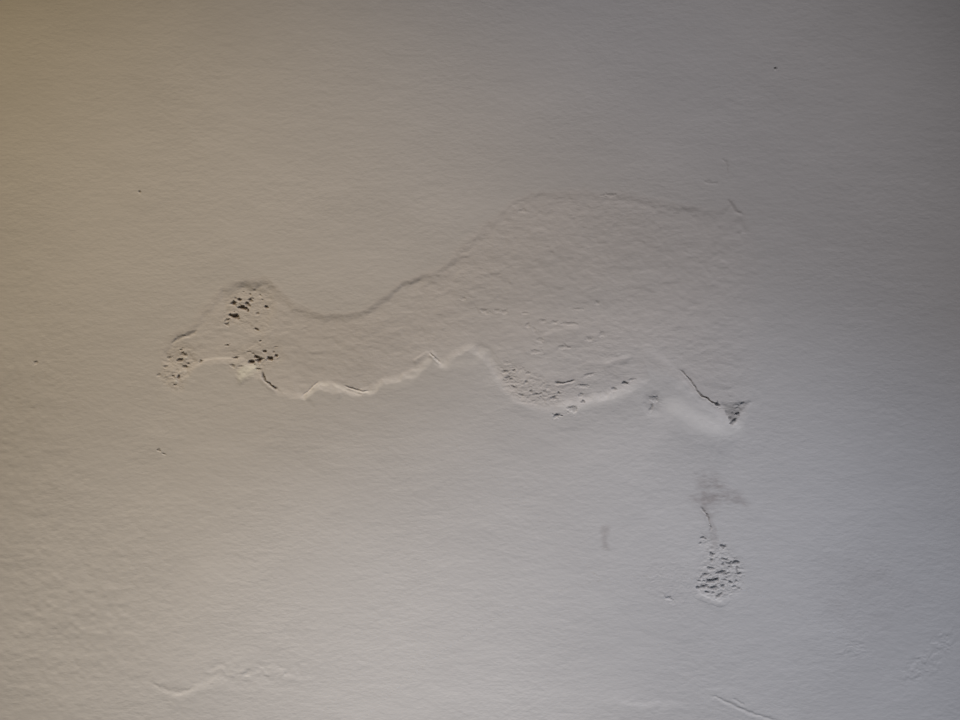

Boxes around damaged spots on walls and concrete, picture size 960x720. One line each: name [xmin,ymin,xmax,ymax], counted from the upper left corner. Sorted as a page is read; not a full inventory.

flaking render [209,274,297,393]
crack [668,358,730,414]
flaking render [663,520,762,617]